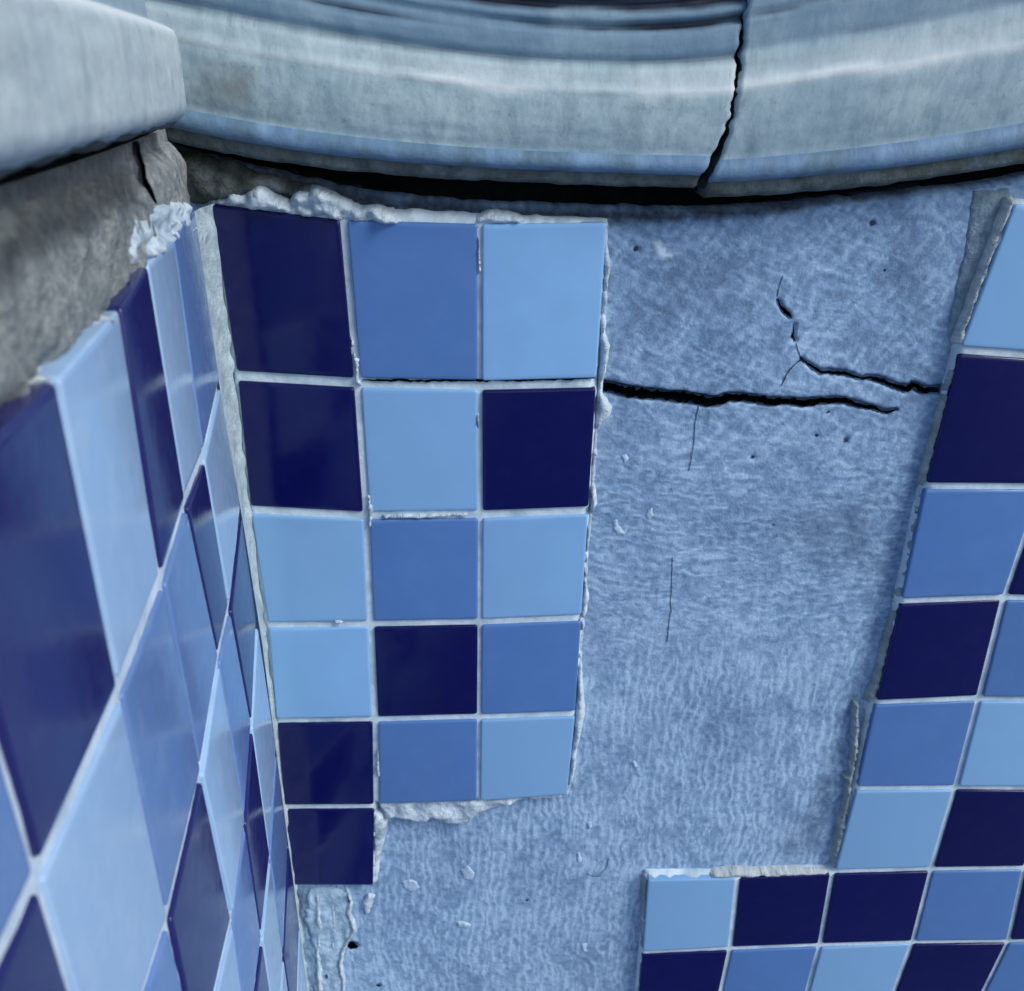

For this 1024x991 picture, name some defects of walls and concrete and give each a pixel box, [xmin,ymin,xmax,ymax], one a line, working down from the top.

crack [0,0,1024,206]
crack [363,276,940,469]
flaking render [170,142,1024,991]